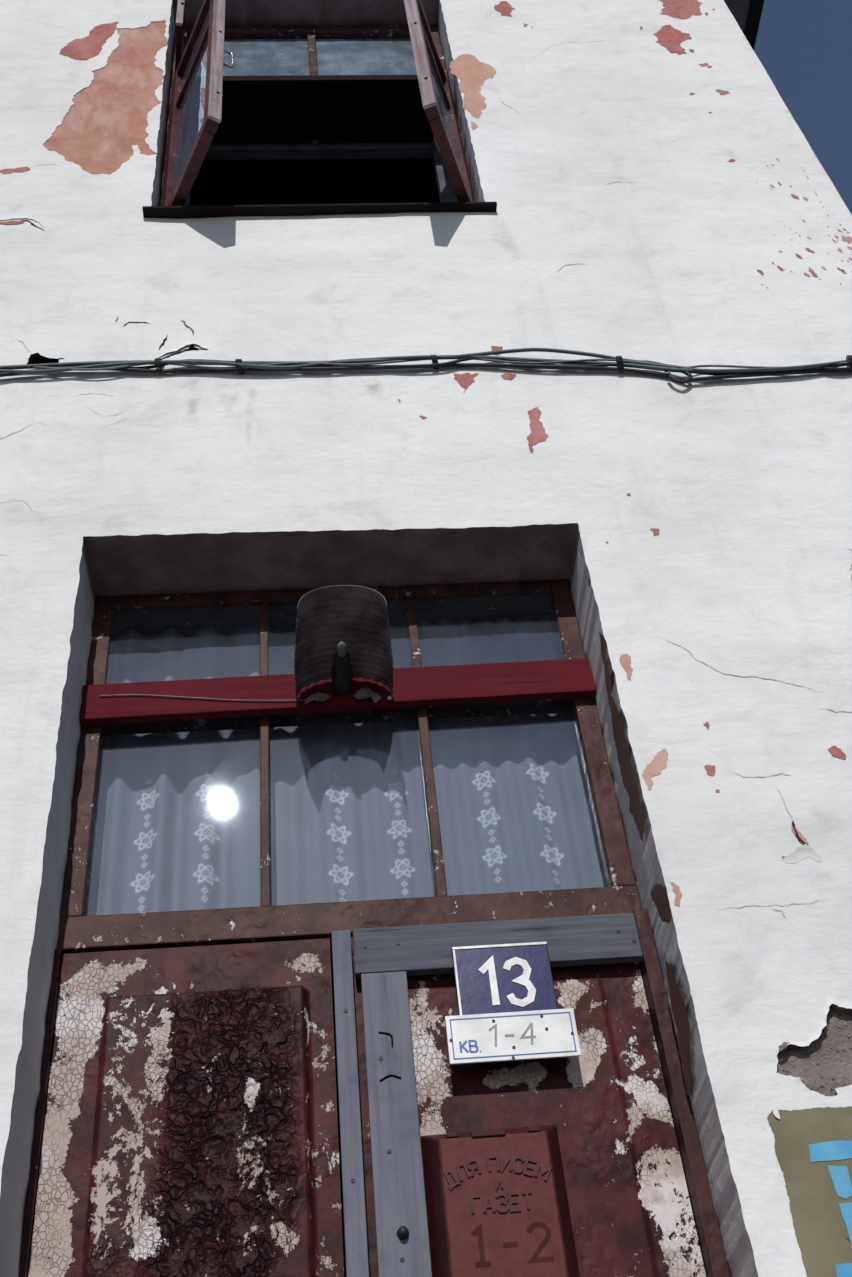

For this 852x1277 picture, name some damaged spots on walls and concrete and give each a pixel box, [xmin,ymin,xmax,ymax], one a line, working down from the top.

peeling [494,1,533,28]
peeling [640,0,715,68]
peeling [43,20,168,175]
peeling [450,54,496,130]
peeling [757,182,852,288]
flaking render [18,340,65,364]
peeling [454,373,479,393]
peeling [527,407,549,453]
crack [659,637,852,713]
peeling [599,631,668,843]
peeling [651,882,682,924]
flaking render [776,996,852,1097]